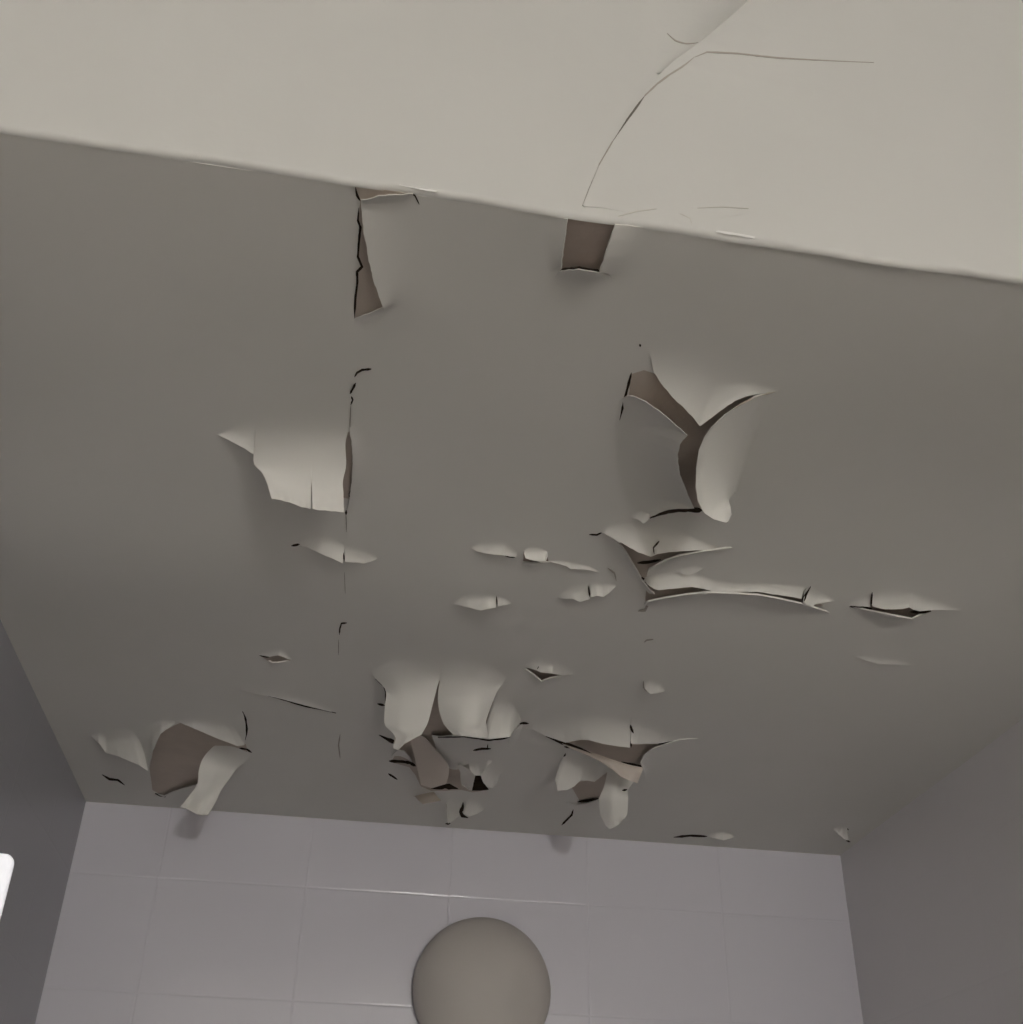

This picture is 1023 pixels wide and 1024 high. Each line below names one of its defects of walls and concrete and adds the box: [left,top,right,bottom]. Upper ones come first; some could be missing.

peeling [354,185,437,329]
peeling [543,217,658,294]
crack [350,368,371,423]
peeling [217,411,383,563]
peeling [472,344,835,622]
peeling [453,592,512,610]
peeling [849,589,962,635]
peeling [91,708,252,815]
peeling [370,657,703,829]